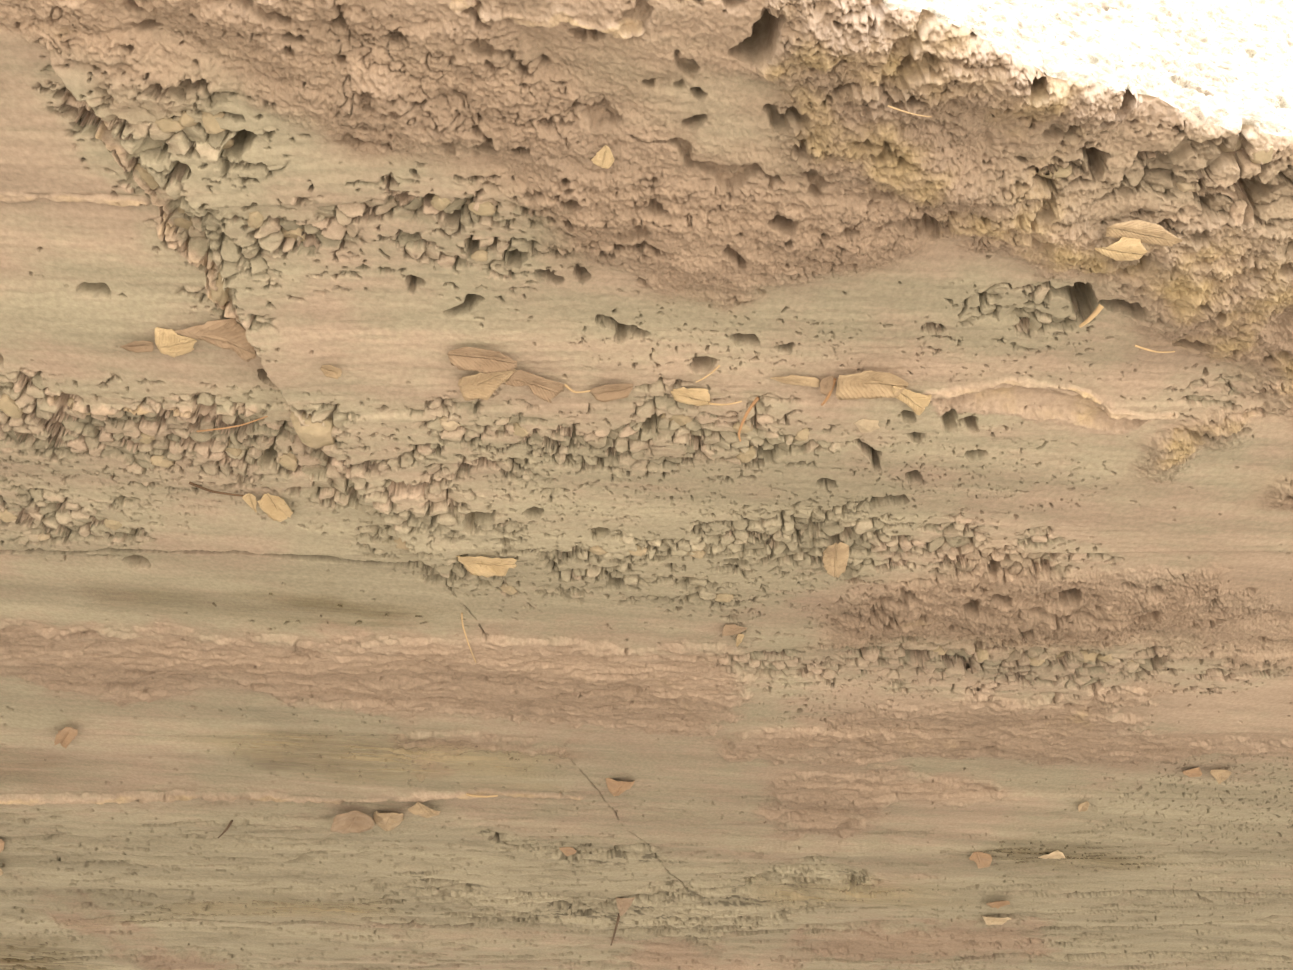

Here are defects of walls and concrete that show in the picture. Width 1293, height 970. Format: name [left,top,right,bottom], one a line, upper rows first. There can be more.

spalling [570,285,920,384]
spalling [493,327,1147,536]